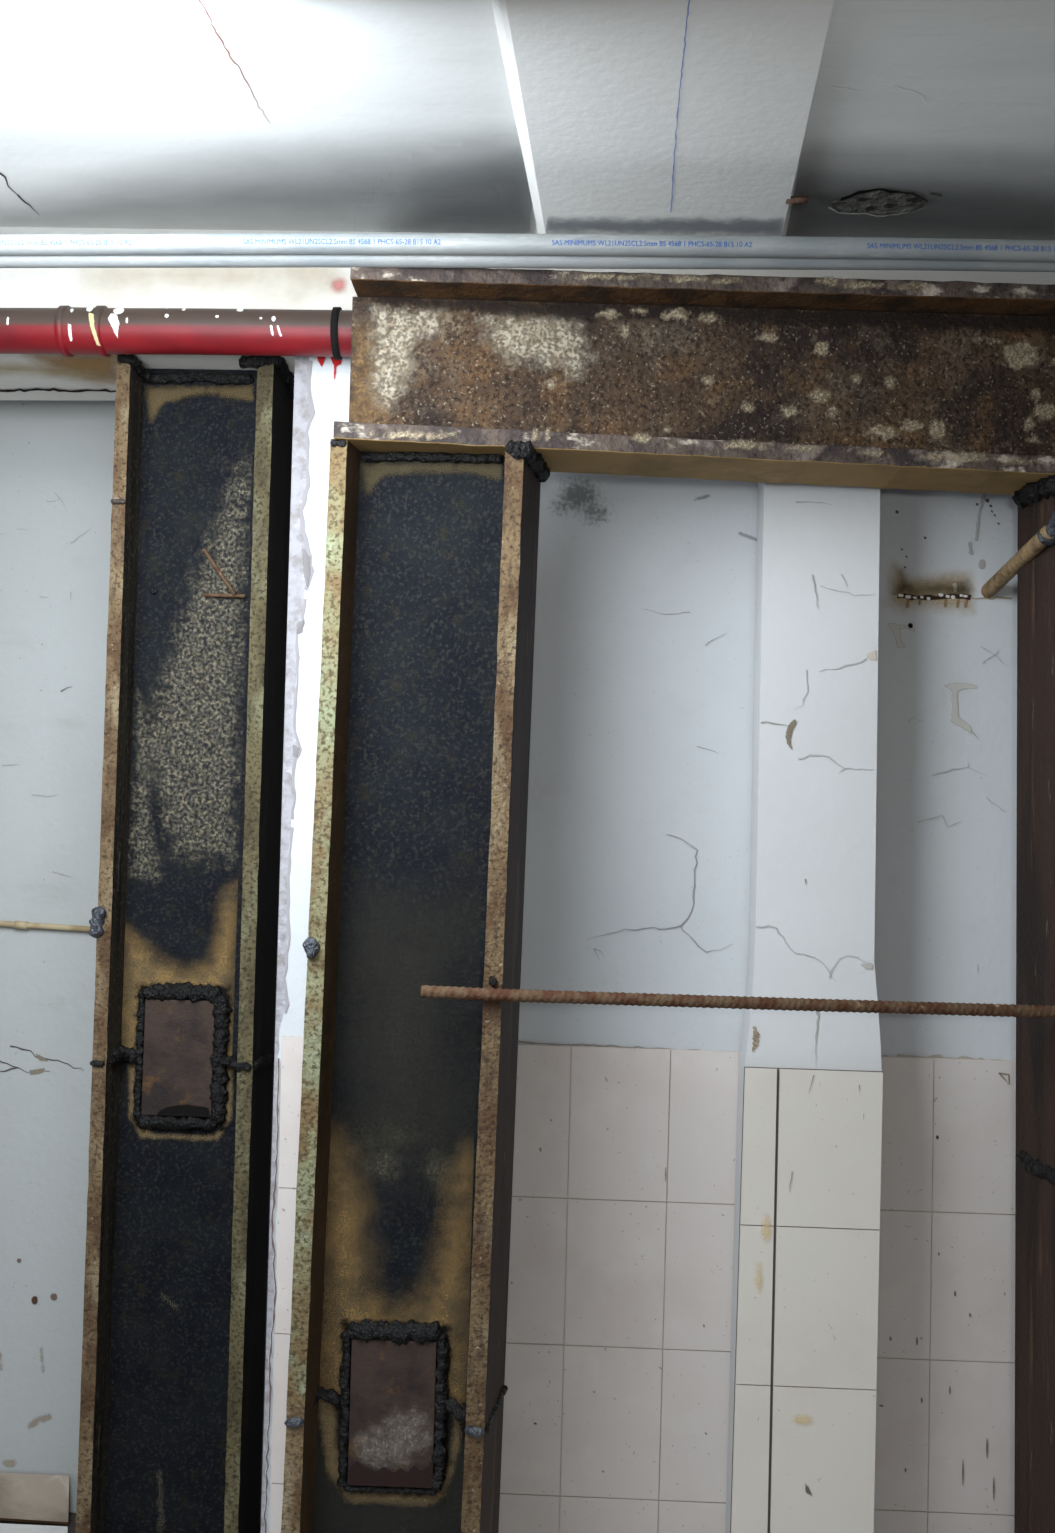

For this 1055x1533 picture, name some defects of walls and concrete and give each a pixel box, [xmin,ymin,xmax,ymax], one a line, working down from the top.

crack [199,0,270,123]
crack [0,173,38,214]
crack [587,834,872,1091]
crack [0,1045,75,1075]
damp [319,1165,465,1505]